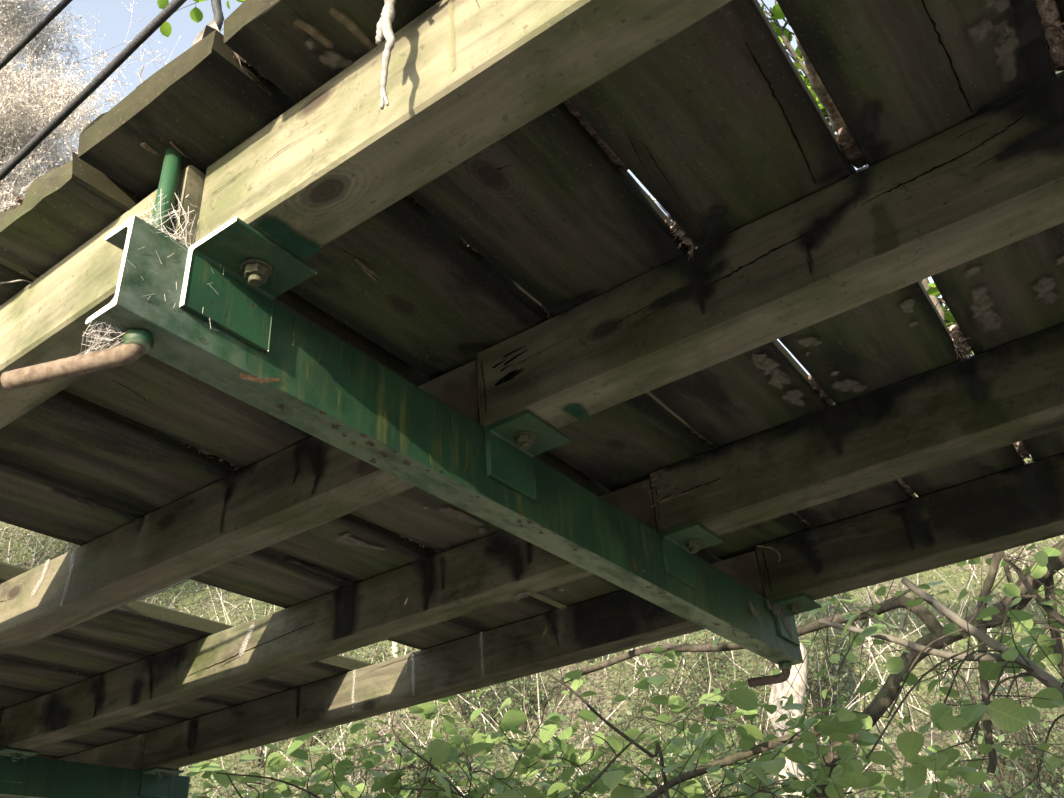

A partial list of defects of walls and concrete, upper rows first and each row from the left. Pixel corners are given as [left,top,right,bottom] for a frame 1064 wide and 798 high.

crack [745,42,817,184]
crack [861,0,1022,206]
leakage [964,0,1064,160]
leakage [799,103,889,273]
leakage [273,417,326,495]
leakage [665,322,1064,471]
leakage [393,535,532,611]